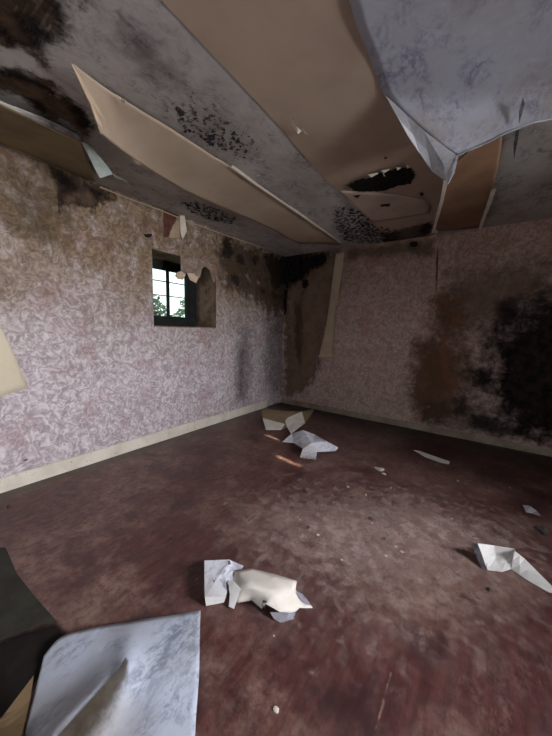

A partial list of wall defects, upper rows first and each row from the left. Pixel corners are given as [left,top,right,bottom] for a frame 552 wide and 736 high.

damp [0,0,68,70]
damp [0,67,118,211]
damp [154,92,258,162]
peeling [161,0,444,233]
peeling [163,209,187,240]
damp [180,200,236,224]
damp [347,164,416,198]
damp [330,206,433,259]
damp [213,235,327,317]
peeling [0,329,28,396]
peeling [281,249,340,397]
damp [451,265,552,442]